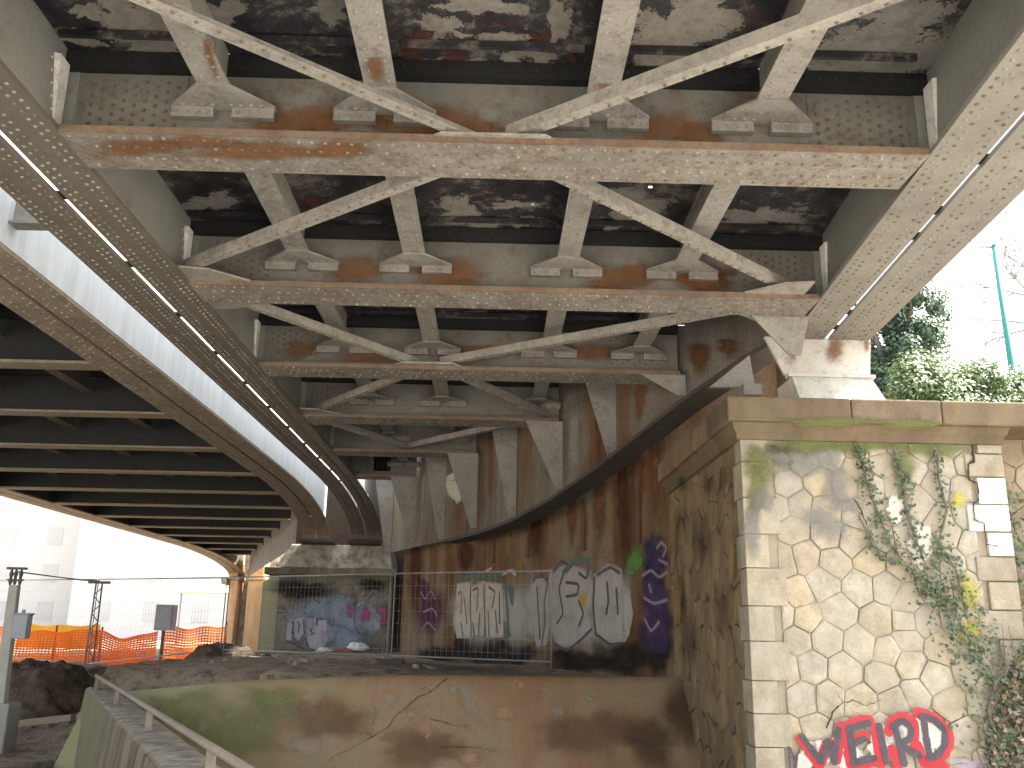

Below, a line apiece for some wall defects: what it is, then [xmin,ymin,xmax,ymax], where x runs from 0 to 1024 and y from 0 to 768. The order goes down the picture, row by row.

peeling [205,0,249,27]
peeling [398,0,582,64]
rust [104,108,366,158]
rust [637,116,721,142]
peeling [437,192,546,229]
peeling [608,183,678,215]
rust [418,261,478,285]
rust [591,266,652,290]
rust [676,269,735,292]
leakage [769,449,858,536]
crack [326,678,491,764]
leakage [668,689,694,737]